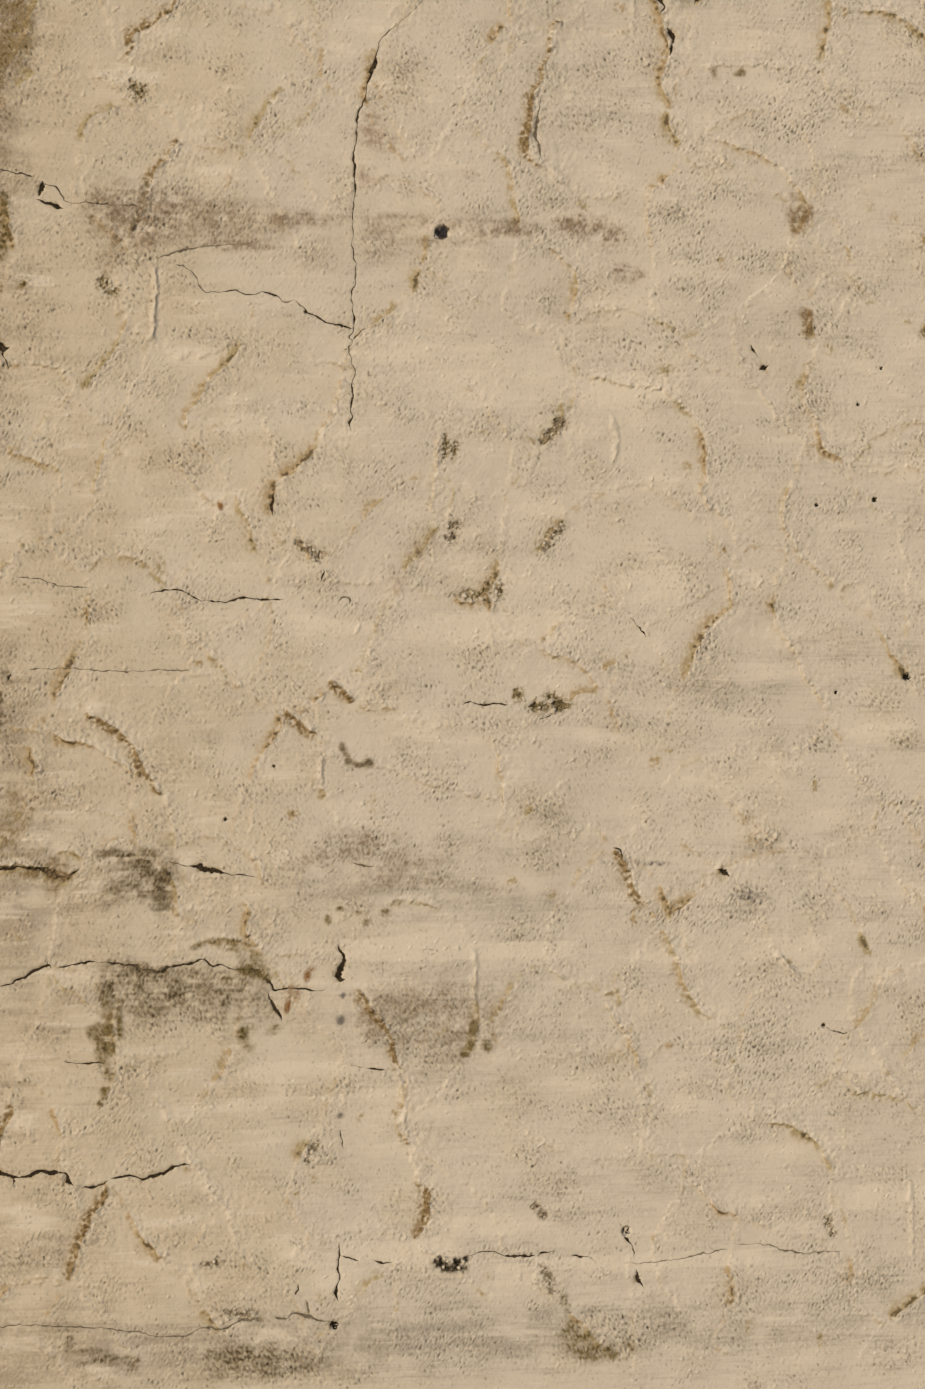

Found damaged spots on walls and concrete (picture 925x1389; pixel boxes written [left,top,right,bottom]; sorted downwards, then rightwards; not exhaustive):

leakage [0,0,32,82]
crack [0,169,137,209]
crack [157,0,422,429]
crack [152,589,282,603]
crack [169,861,254,877]
crack [2,945,346,1021]
leakage [222,953,268,980]
leakage [87,1023,114,1106]
leakage [452,1021,491,1057]
crack [0,1163,189,1189]
crack [619,1223,840,1287]
crack [1,1246,391,1337]